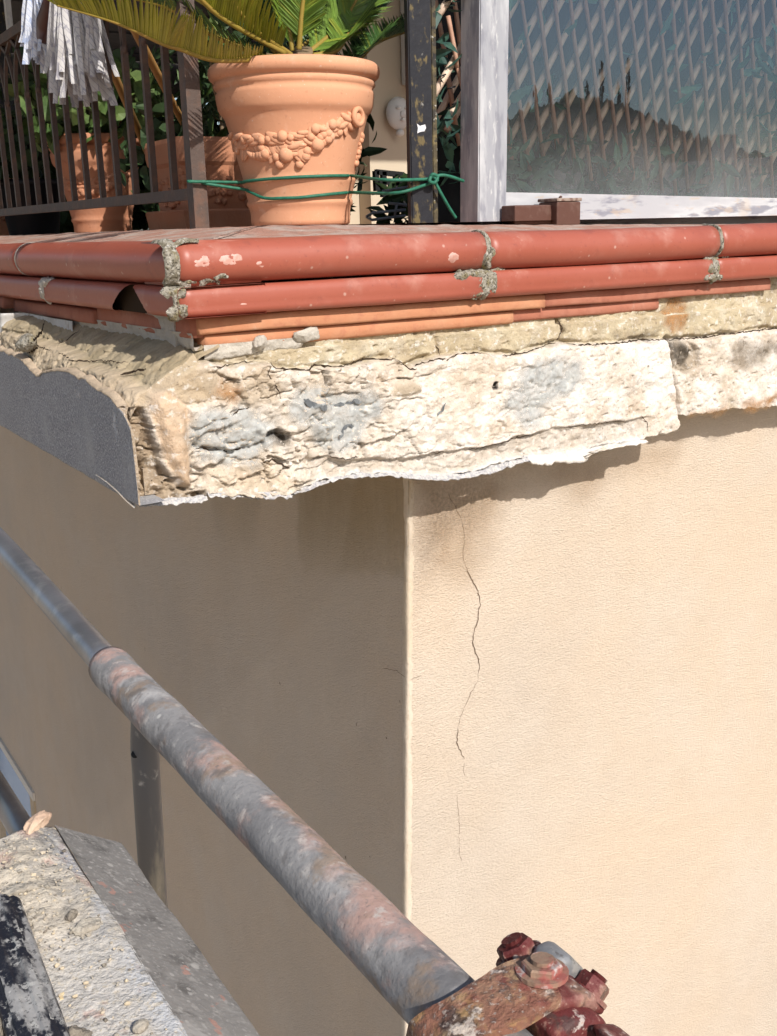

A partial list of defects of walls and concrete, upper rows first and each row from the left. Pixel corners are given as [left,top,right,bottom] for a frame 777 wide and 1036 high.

spalling [0,277,777,508]
crack [212,319,777,406]